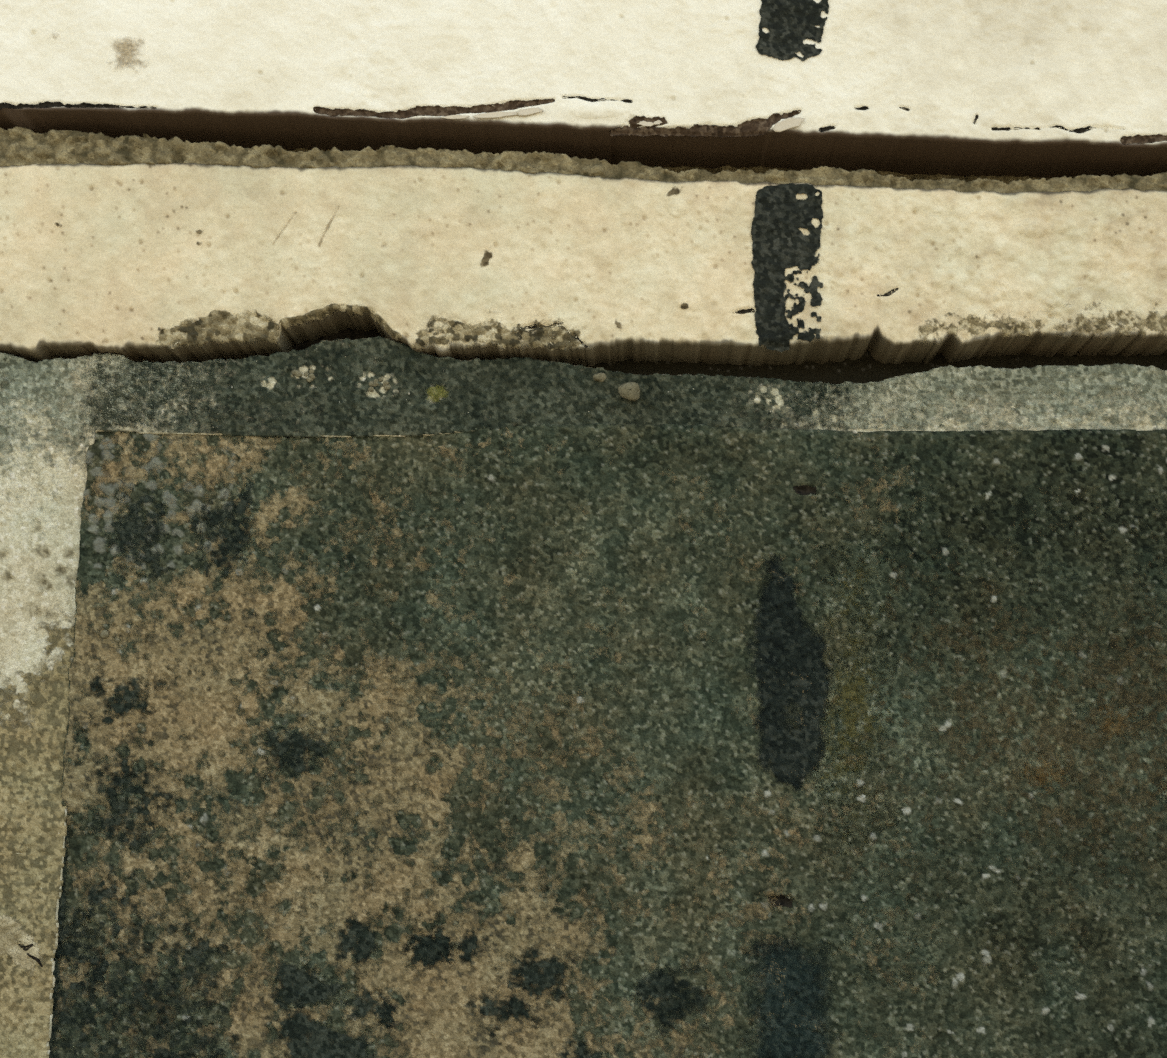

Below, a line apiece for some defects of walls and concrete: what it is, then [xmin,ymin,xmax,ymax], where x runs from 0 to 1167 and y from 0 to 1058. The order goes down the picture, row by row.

crack [0,101,156,109]
peeling [313,98,555,119]
peeling [610,110,805,137]
crack [819,125,835,133]
crack [973,115,1093,133]
crack [735,307,755,315]
crack [291,328,386,351]
spalling [156,304,581,350]
crack [524,322,588,348]
damp [0,336,1167,1058]